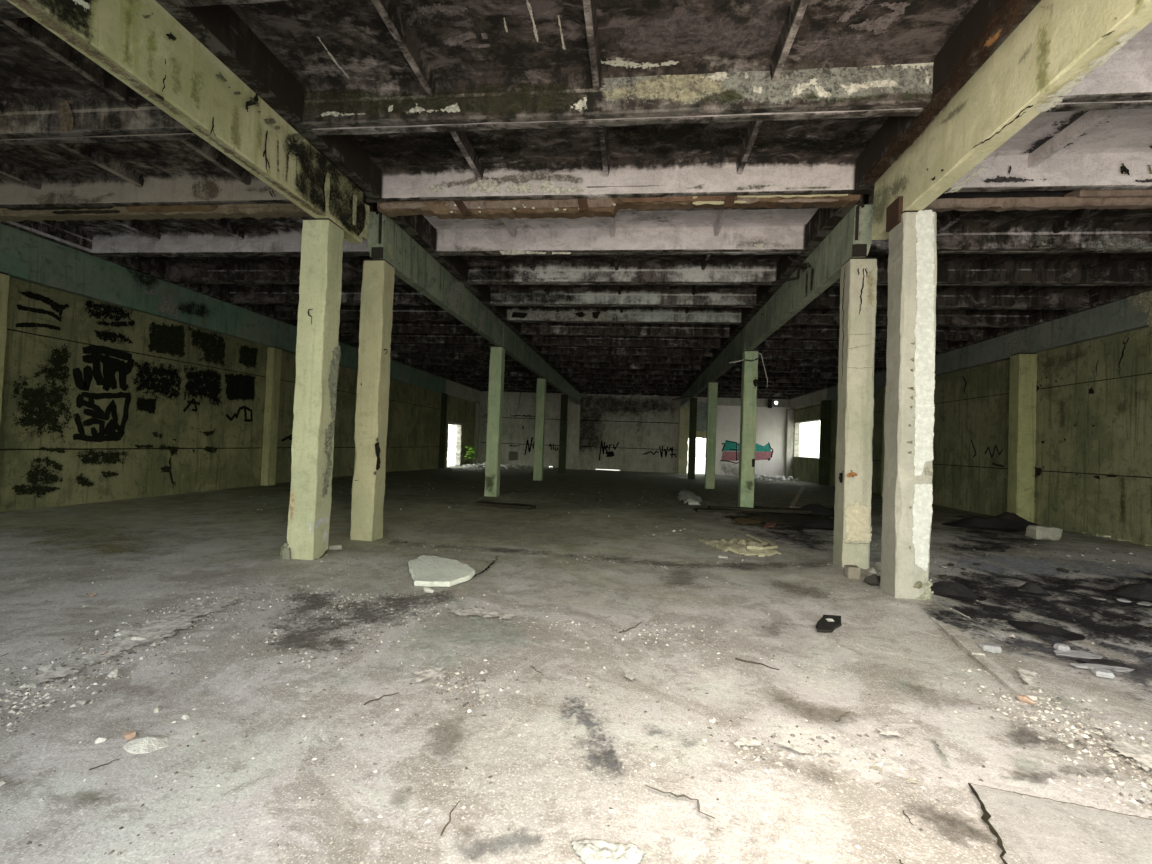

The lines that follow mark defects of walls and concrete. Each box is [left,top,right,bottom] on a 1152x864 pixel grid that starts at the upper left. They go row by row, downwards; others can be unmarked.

leakage [526,0,538,42]
efflorescence [388,103,461,113]
efflorescence [569,92,588,112]
leakage [602,64,933,106]
leakage [192,126,330,216]
peeling [907,209,935,589]
crack [645,784,715,819]